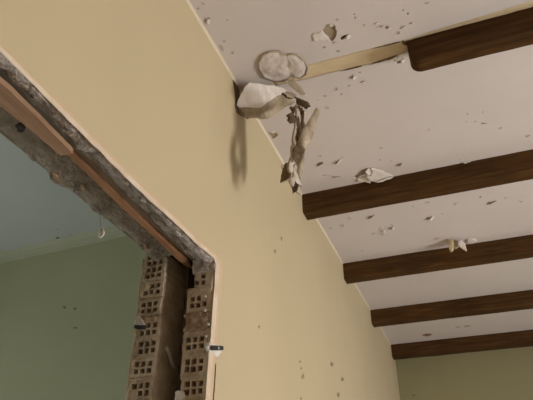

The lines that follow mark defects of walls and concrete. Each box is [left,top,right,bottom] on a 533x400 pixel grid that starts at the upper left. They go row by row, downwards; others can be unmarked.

flaking render [272,1,533,86]
spalling [233,81,241,116]
flaking render [0,43,222,344]
peeling [355,168,393,183]
flaking render [206,351,216,400]